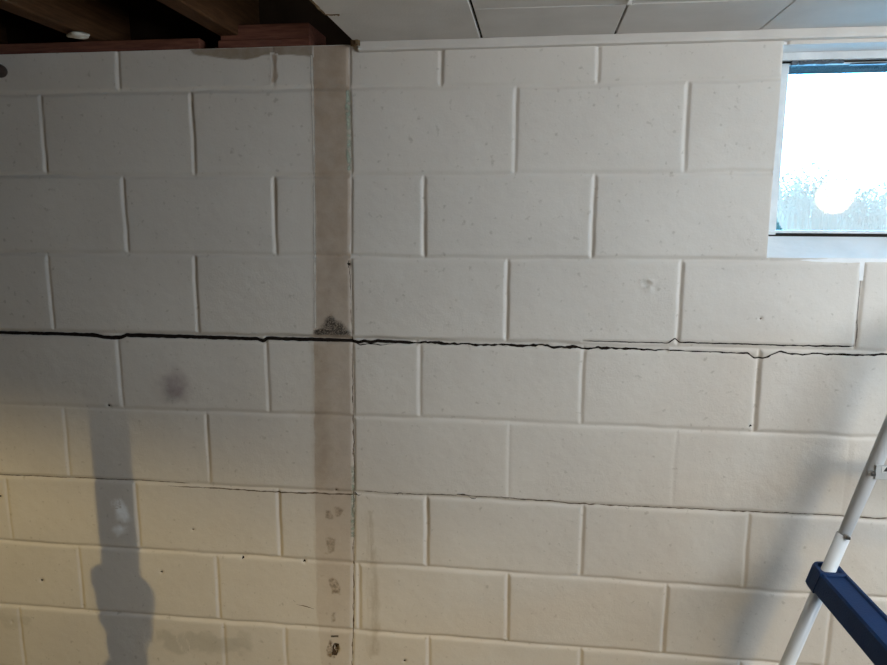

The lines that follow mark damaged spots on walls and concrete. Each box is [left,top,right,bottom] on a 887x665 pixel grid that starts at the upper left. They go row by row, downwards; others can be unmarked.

damp [315,316,347,335]
damp [153,357,196,407]
crack [0,281,887,665]